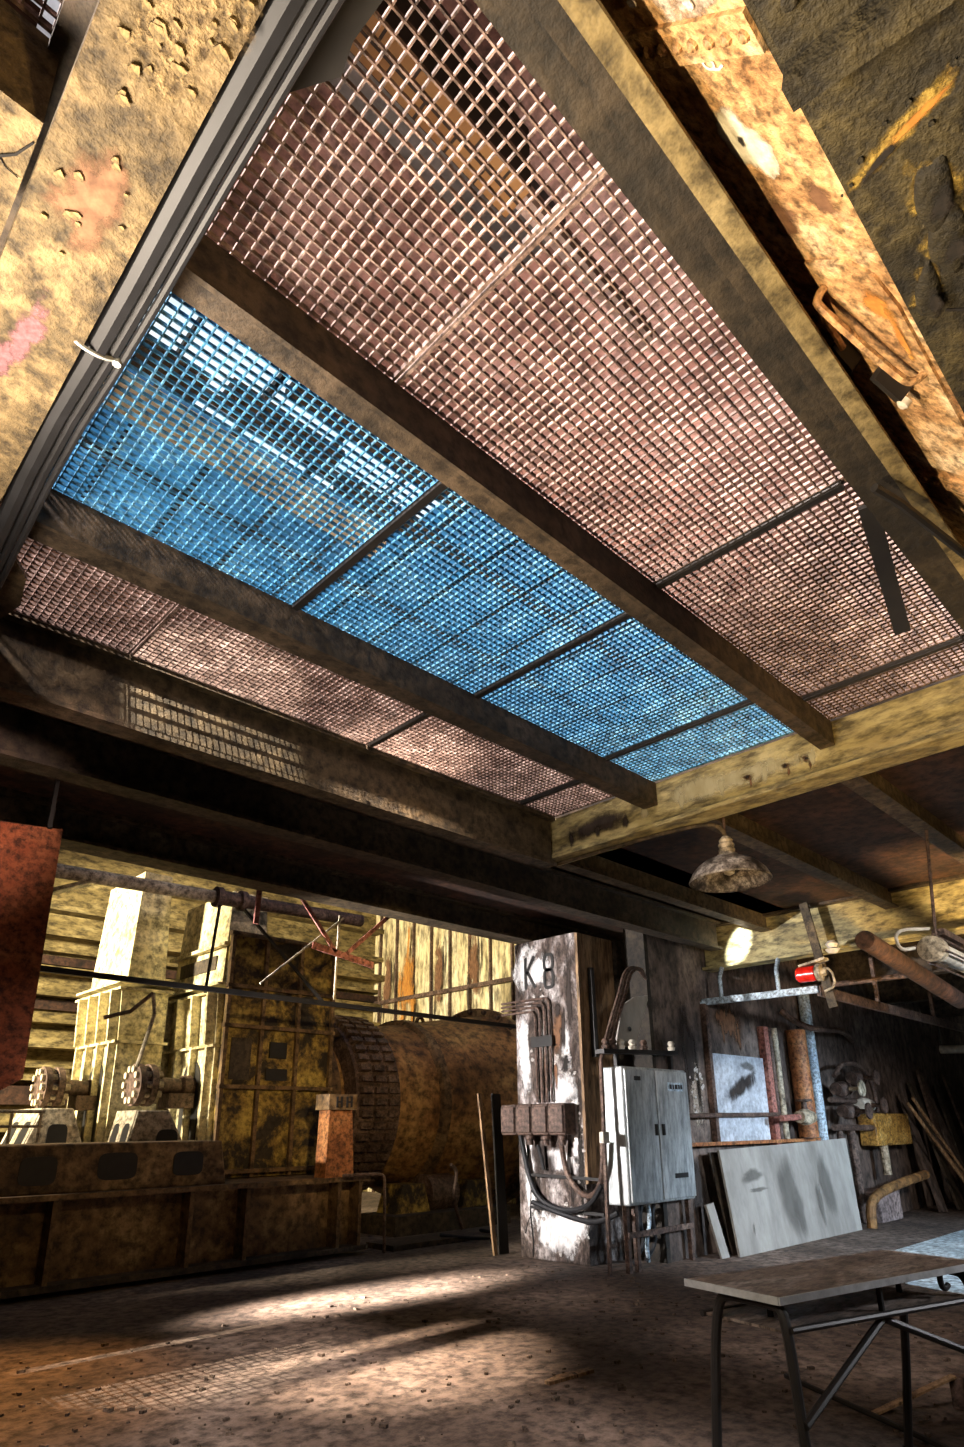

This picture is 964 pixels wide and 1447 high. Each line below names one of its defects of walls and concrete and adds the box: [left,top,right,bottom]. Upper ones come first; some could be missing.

corrosion [765,188,799,239]
corrosion [808,182,838,214]
corrosion [863,291,914,359]